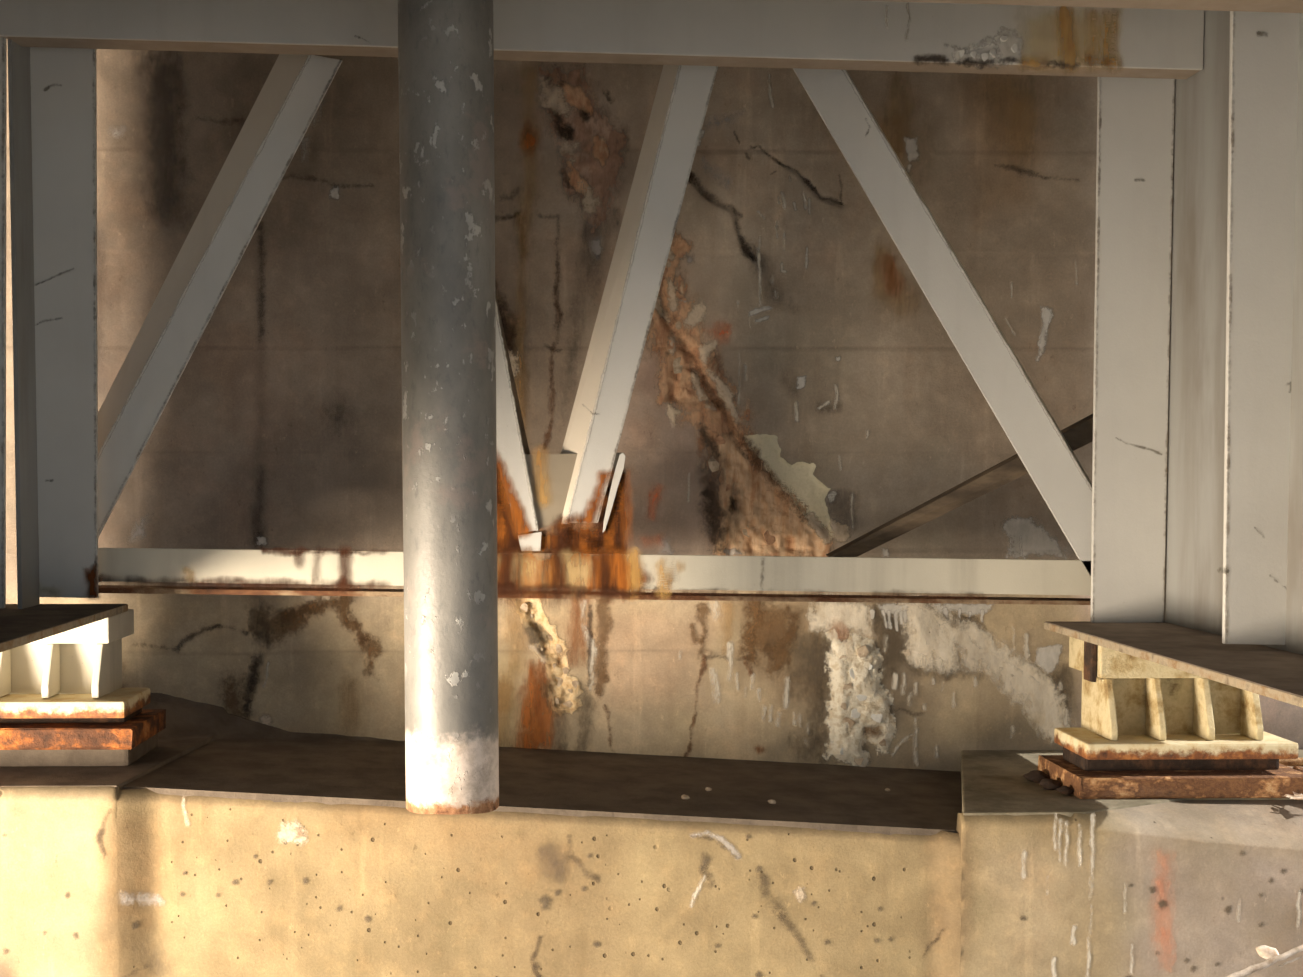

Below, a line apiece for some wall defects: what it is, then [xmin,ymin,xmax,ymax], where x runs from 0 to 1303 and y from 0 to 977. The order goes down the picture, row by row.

spalling [538,66,628,233]
crack [689,172,739,229]
crack [736,136,842,205]
crack [543,254,562,449]
spalling [647,233,850,557]
rust [85,565,298,599]
rust [262,547,384,591]
rust [497,449,736,695]
damp [243,596,381,726]
rust [517,666,553,749]
crack [698,655,710,682]
damp [712,601,1070,767]